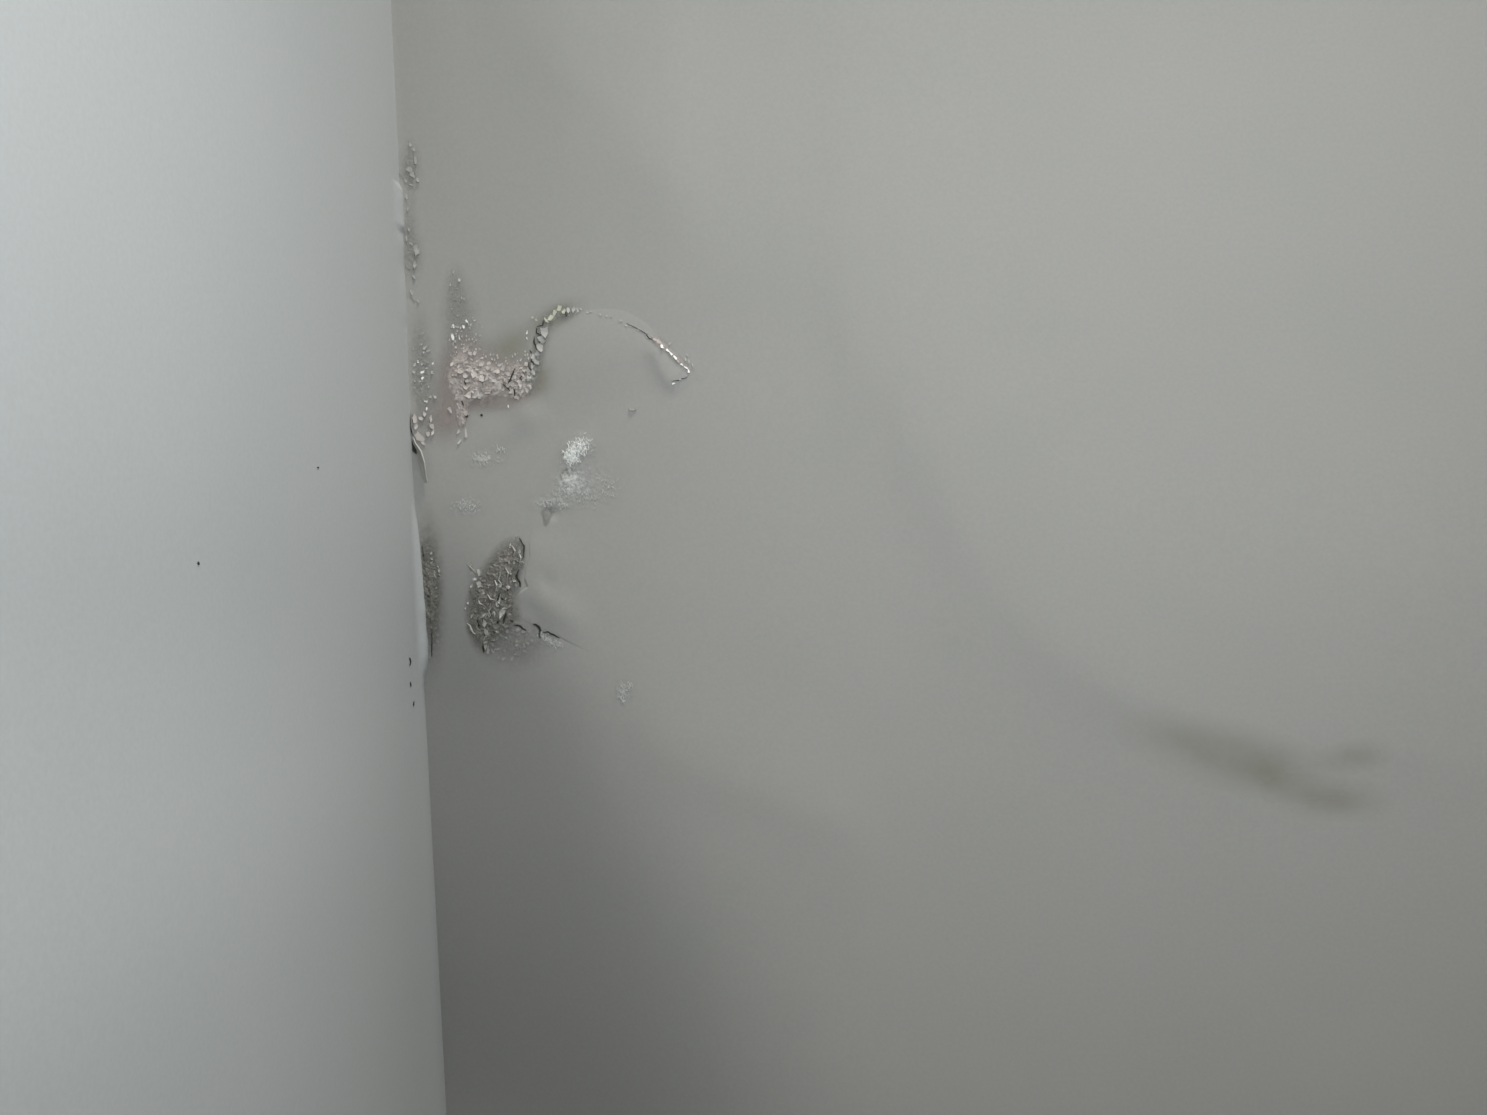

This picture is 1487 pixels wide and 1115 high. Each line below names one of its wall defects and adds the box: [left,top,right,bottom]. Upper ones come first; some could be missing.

peeling [412,270,693,445]
peeling [421,540,441,657]
peeling [464,535,525,654]